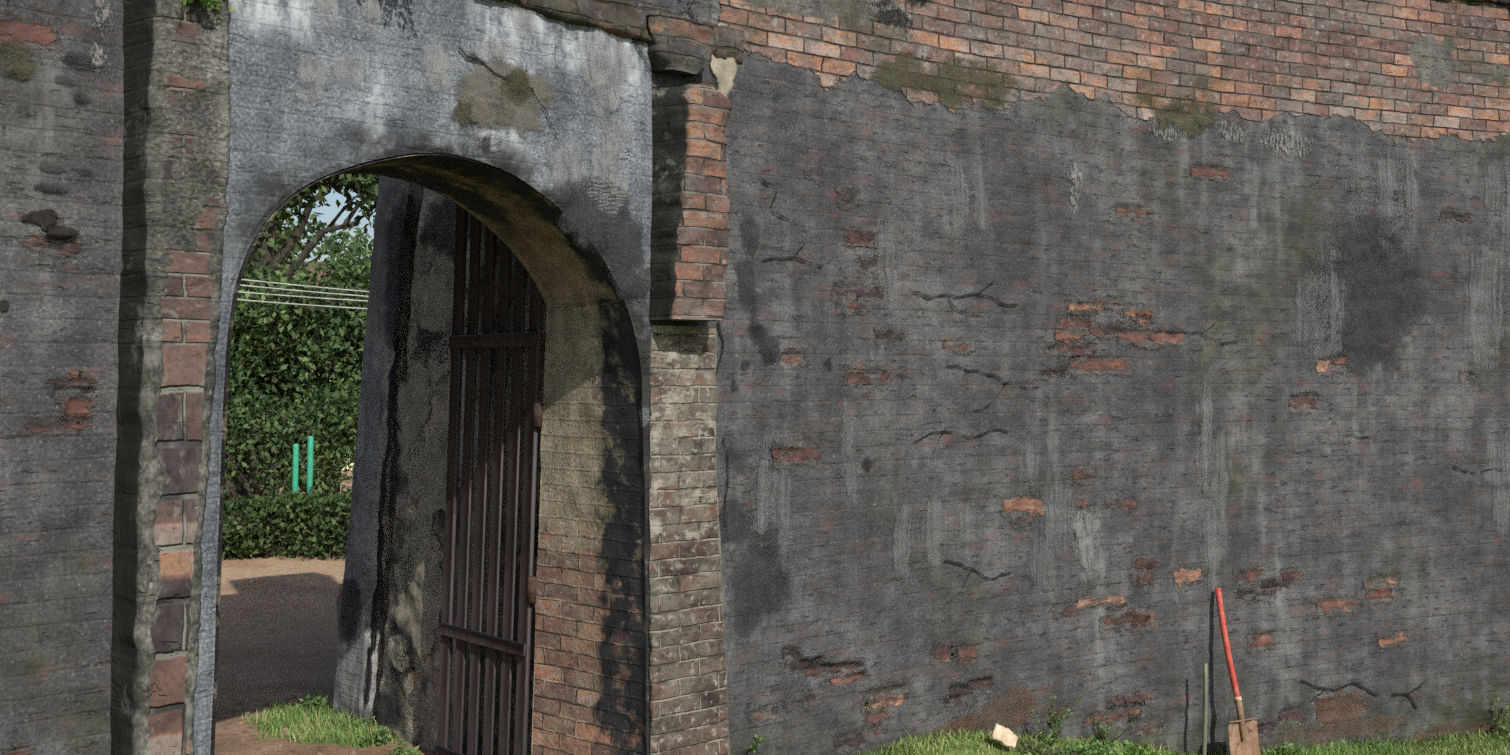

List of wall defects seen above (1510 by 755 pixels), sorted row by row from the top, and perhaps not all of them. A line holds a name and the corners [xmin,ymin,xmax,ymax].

flaking render [0,8,64,53]
flaking render [719,0,1510,144]
leakage [1317,211,1427,375]
flaking render [780,643,913,755]